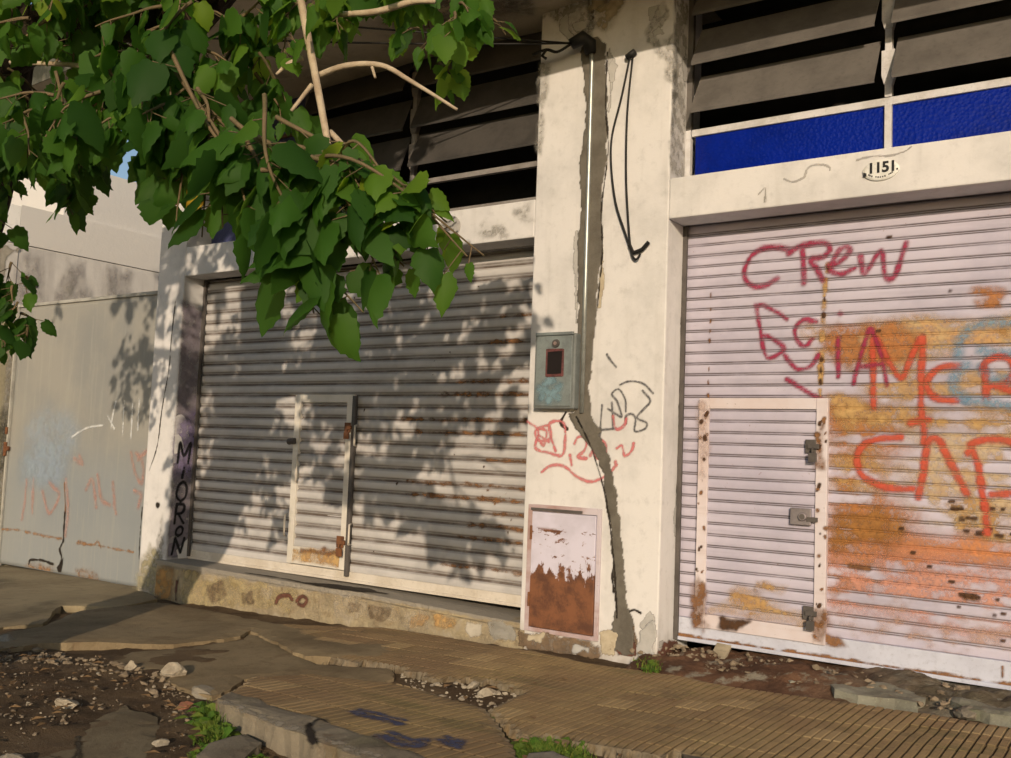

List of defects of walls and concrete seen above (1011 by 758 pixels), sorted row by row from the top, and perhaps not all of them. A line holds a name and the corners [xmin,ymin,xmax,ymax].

leakage [588,0,624,32]
peeling [607,49,618,112]
corrosion [441,378,529,397]
corrosion [402,417,528,436]
corrosion [678,263,1011,681]
corrosion [396,479,525,545]
crack [559,411,641,656]
corrosion [293,547,339,567]
crack [52,736,82,758]